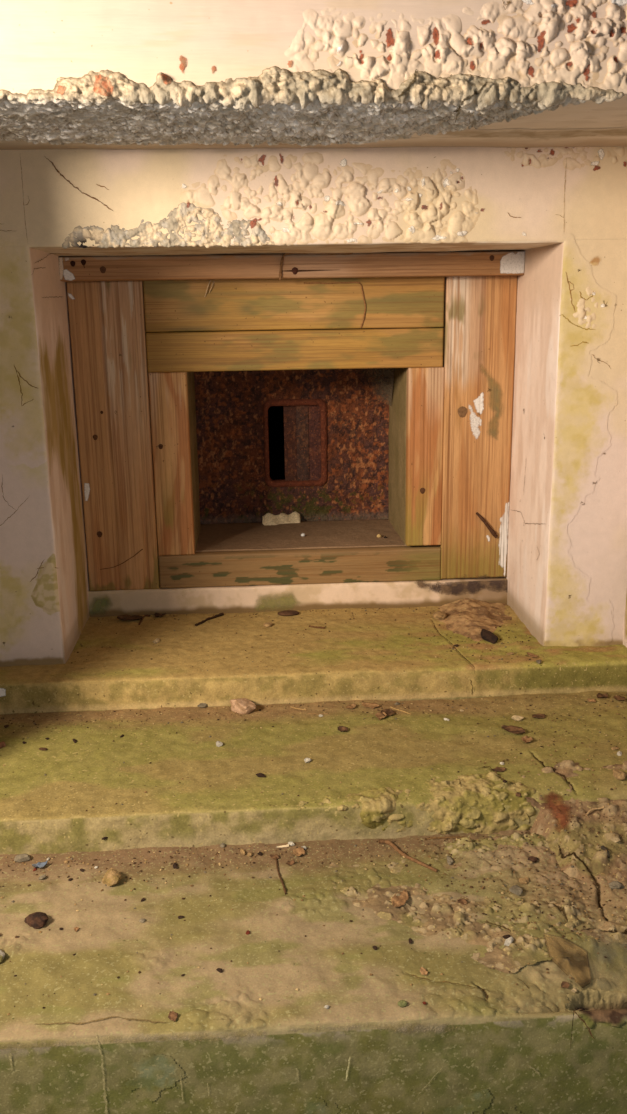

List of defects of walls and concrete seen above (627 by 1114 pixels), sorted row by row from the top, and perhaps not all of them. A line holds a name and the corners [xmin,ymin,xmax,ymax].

spalling [0,55,625,147]
crack [398,69,417,97]
crack [454,82,487,121]
crack [46,158,113,211]
spalling [62,202,290,249]
crack [531,752,576,792]
spalling [250,762,549,869]
crack [546,845,627,934]
spalling [328,859,627,974]
spalling [565,988,627,1029]